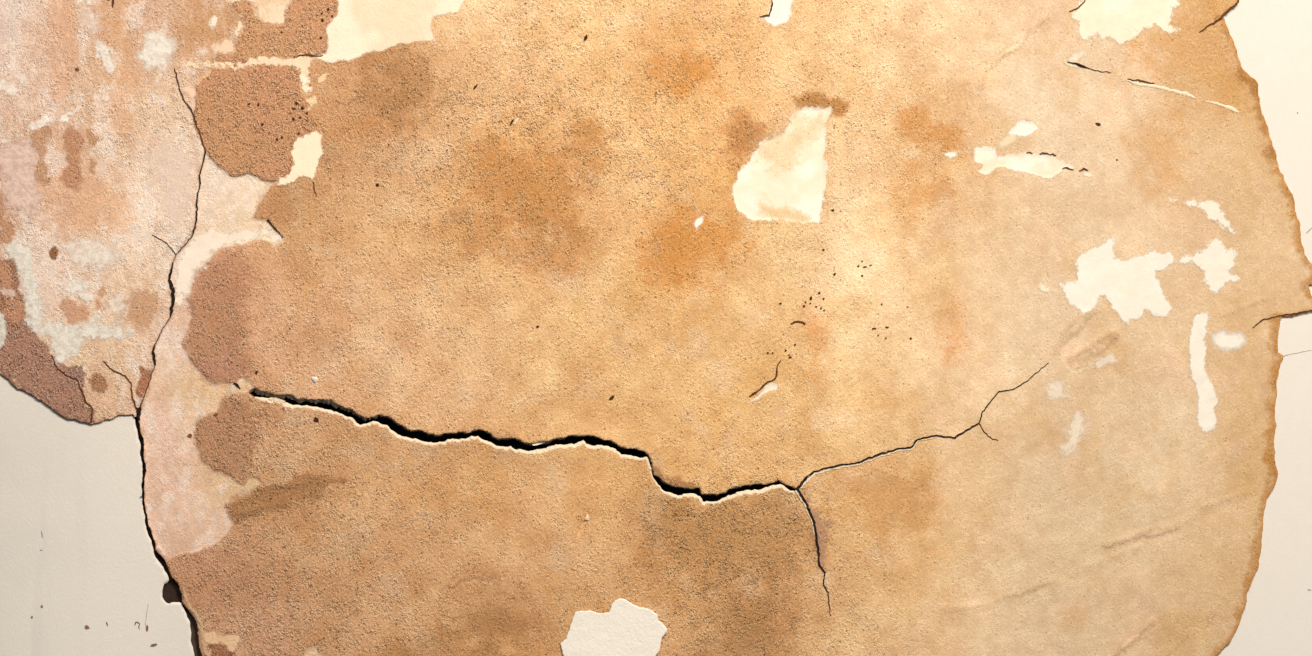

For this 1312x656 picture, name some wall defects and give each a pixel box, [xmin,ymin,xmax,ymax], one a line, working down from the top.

water stain [190,0,339,181]
peeling [0,0,244,425]
water stain [128,291,158,326]
water stain [187,262,249,381]
crack [51,355,93,423]
crack [104,68,210,656]
water stain [196,400,254,474]
water stain [231,474,343,522]
crack [233,360,1048,615]
water stain [653,467,695,489]
water stain [209,644,233,656]